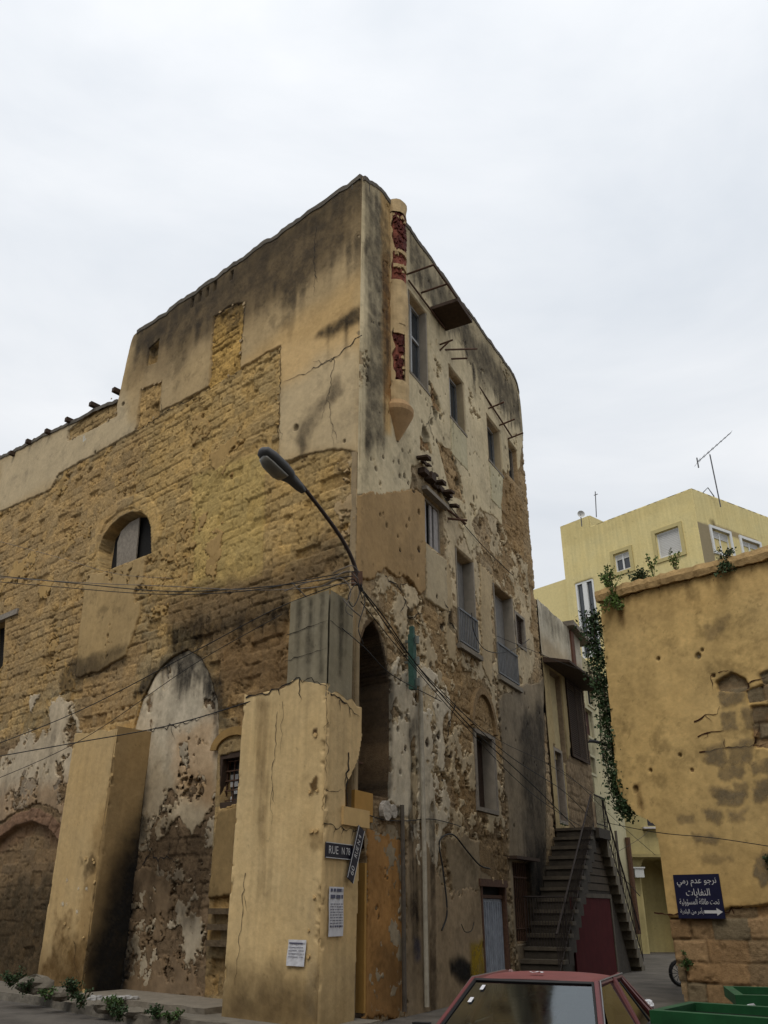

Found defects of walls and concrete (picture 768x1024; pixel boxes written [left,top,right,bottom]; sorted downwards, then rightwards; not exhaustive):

crack [277,335,362,451]
peeling [204,793,216,848]
crack [246,620,357,834]
peeling [360,439,536,972]
crack [694,670,766,753]
peeling [705,740,768,822]
peeling [128,796,206,986]